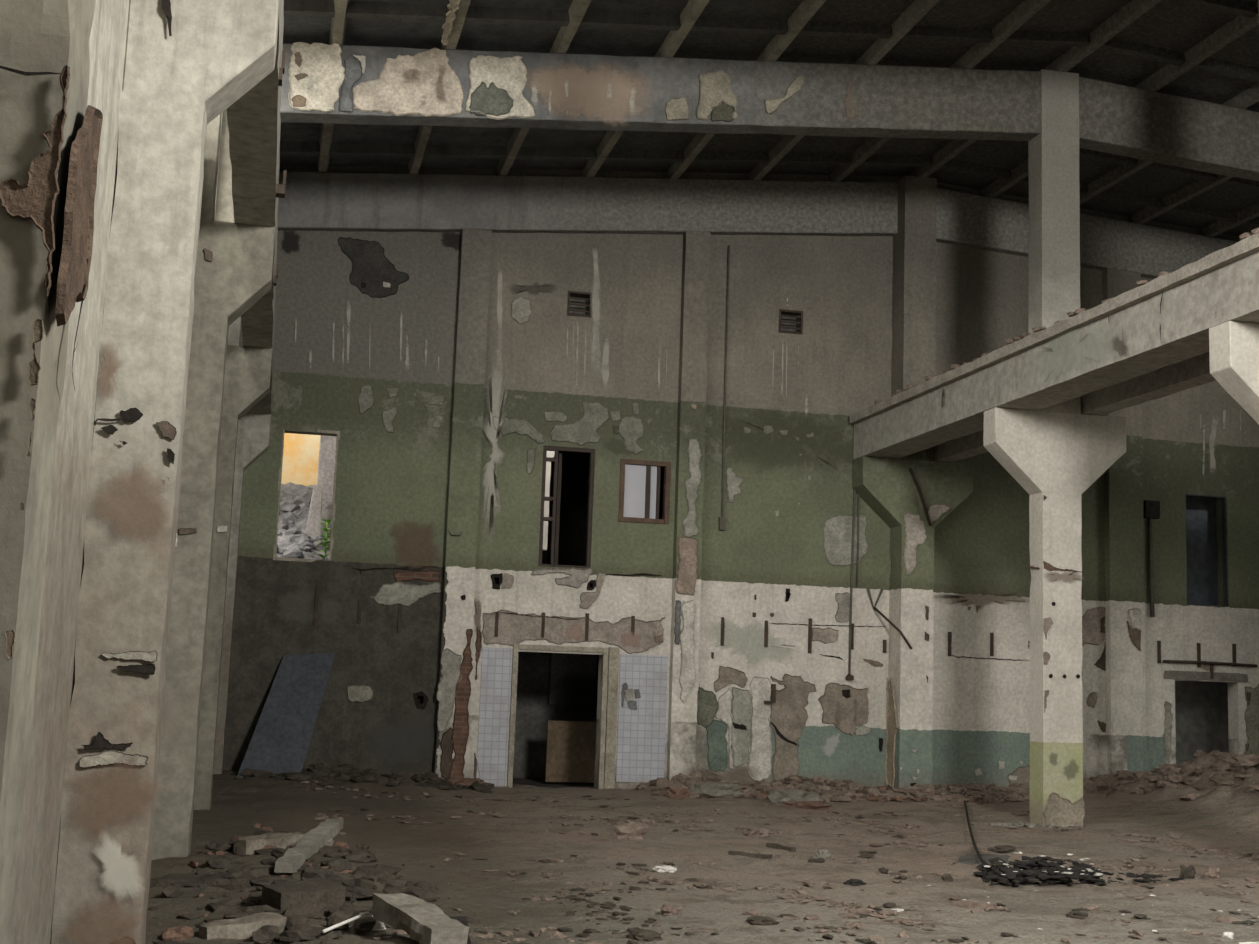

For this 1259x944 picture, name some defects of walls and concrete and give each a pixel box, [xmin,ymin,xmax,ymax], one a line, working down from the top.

peeling [288,0,536,120]
spalling [338,237,409,298]
spalling [101,408,143,445]
spalling [156,421,177,481]
peeling [493,401,645,475]
flaking render [413,438,920,788]
spalling [1043,617,1053,665]
flaking render [1082,607,1106,671]
spalling [1086,692,1113,732]
spalling [1244,684,1259,755]